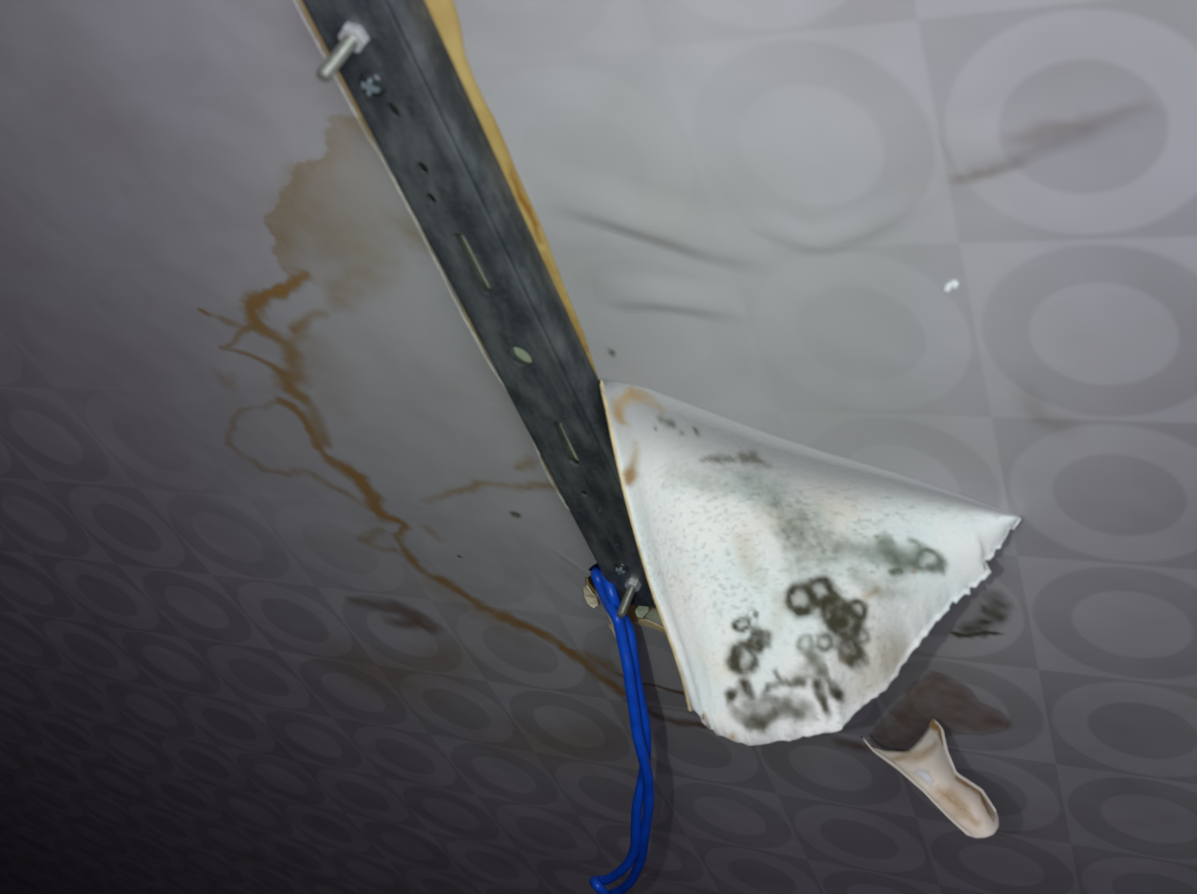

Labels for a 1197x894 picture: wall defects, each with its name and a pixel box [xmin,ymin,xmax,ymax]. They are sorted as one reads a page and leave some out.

peeling [293,0,330,60]
peeling [334,71,507,391]
peeling [424,0,1022,745]
water stain [228,272,626,696]
water stain [624,466,635,485]
water stain [726,577,869,713]
water stain [887,548,945,575]
water stain [951,601,1005,637]
water stain [743,710,778,730]
peeling [861,719,999,839]